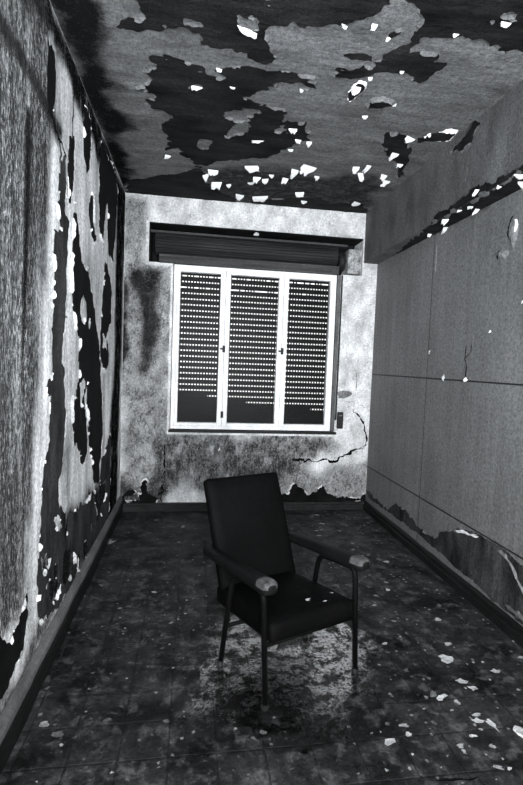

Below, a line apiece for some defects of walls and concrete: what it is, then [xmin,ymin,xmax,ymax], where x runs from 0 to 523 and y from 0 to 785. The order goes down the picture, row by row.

peeling [332,0,523,102]
peeling [362,96,396,120]
peeling [380,118,480,187]
peeling [392,165,523,256]
water stain [0,0,378,670]
peeling [0,0,390,699]
crack [292,375,368,463]
spalling [281,483,523,625]
crack [436,777,485,785]